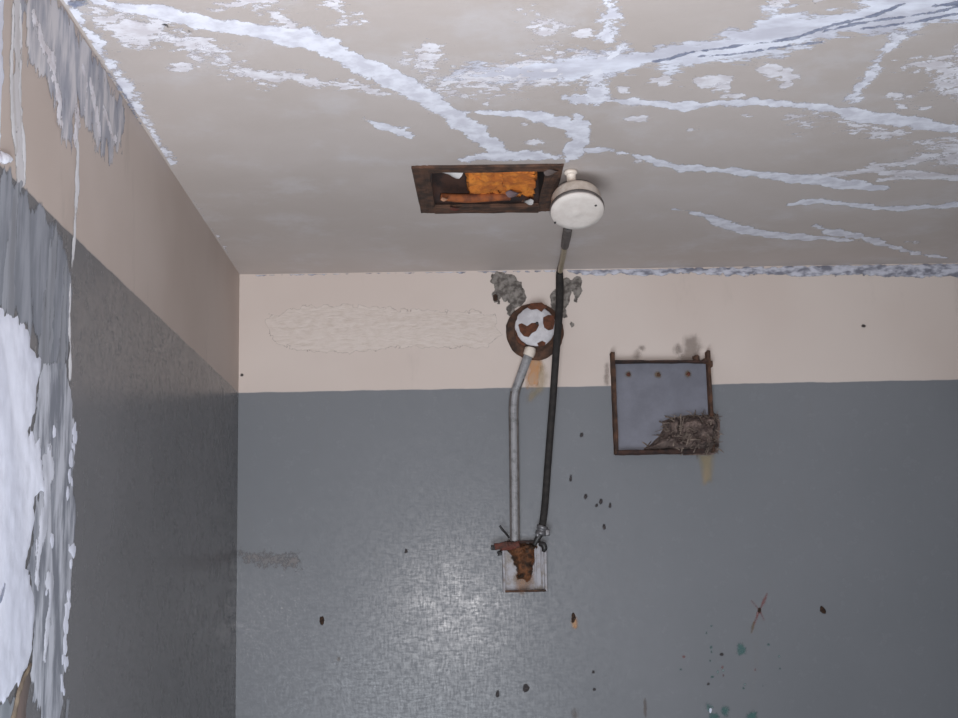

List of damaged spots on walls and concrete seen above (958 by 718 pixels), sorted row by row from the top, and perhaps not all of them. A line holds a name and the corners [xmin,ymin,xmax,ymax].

peeling [207,0,299,29]
peeling [315,0,370,29]
peeling [397,0,958,106]
peeling [20,0,279,165]
spalling [364,118,416,139]
peeling [812,112,958,168]
spalling [0,151,13,164]
corrosion [465,172,538,199]
peeling [506,190,534,205]
peeling [478,264,958,327]
peeling [0,308,77,718]